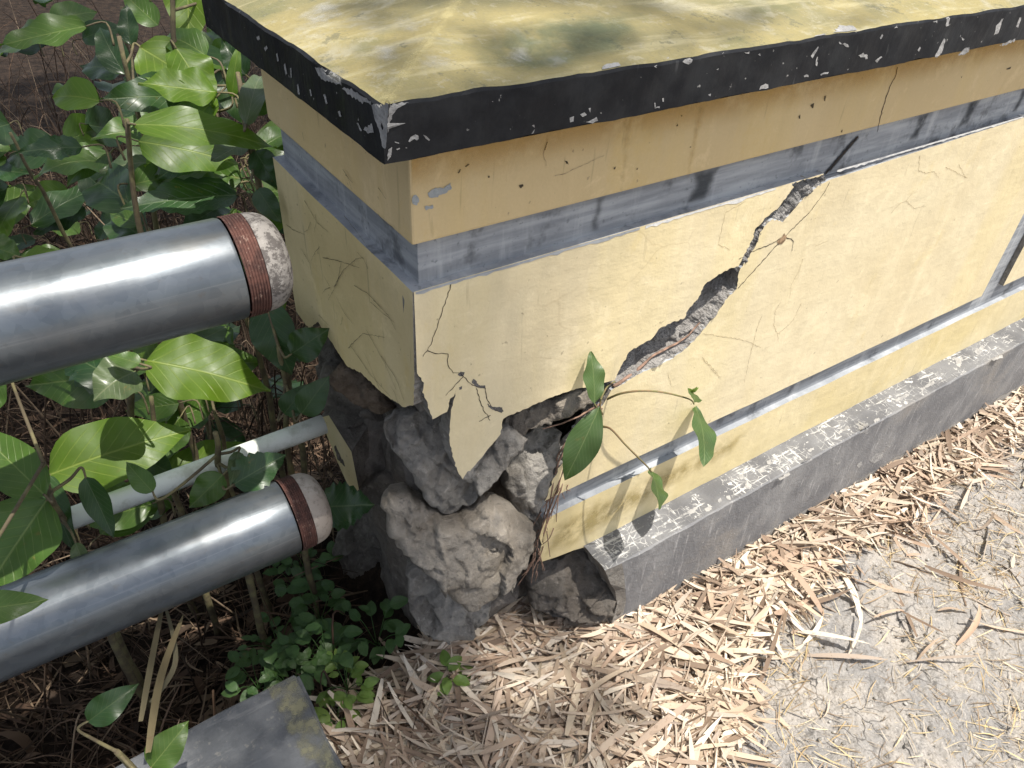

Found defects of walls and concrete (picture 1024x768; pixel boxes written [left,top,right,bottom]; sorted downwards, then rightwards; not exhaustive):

spalling [804,25,882,77]
peeling [934,17,950,58]
peeling [994,17,1021,46]
spalling [257,36,430,161]
peeling [412,184,452,210]
crack [605,67,898,388]
crack [423,284,501,422]
peeling [838,418,880,434]